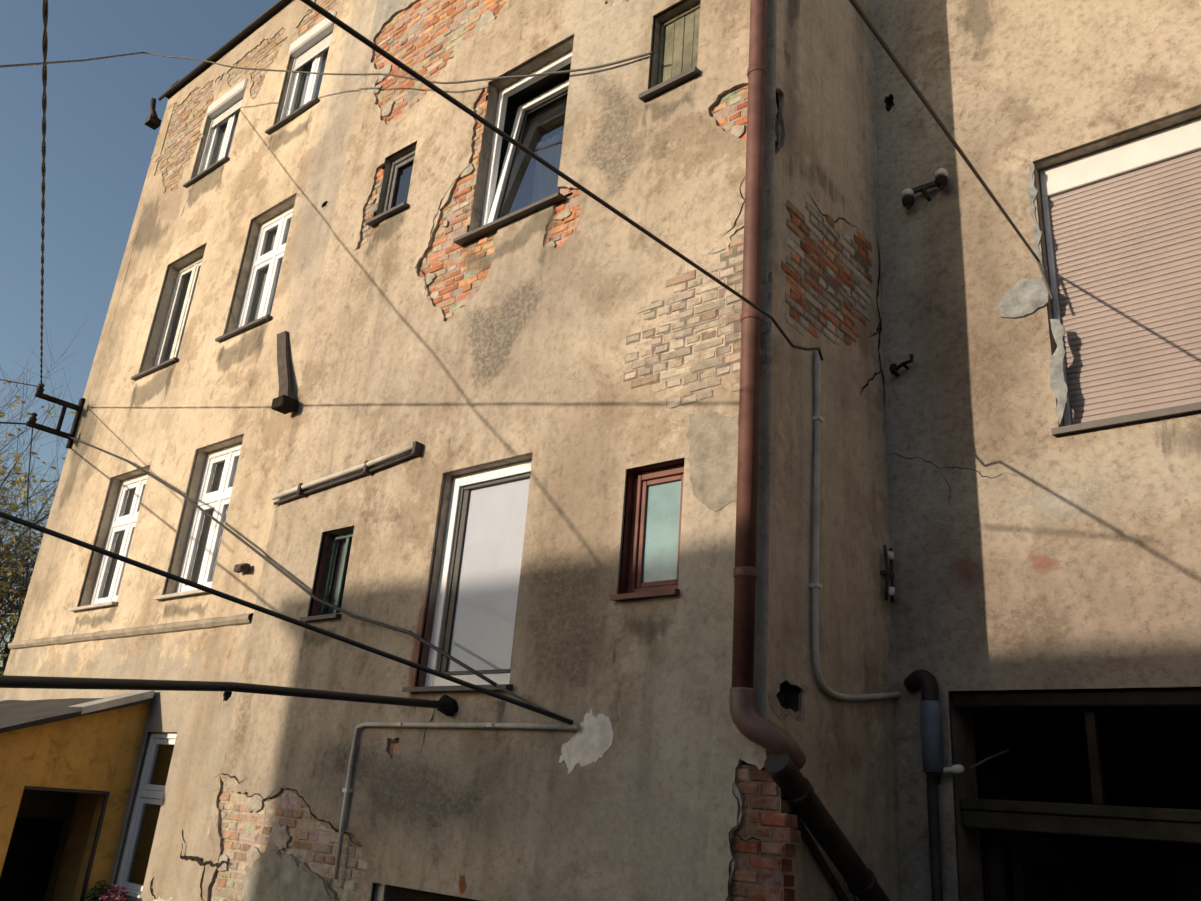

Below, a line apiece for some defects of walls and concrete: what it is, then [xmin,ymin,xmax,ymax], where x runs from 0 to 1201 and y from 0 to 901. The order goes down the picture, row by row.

flaking render [372,0,508,124]
flaking render [710,83,748,139]
flaking render [359,165,385,250]
flaking render [415,91,497,321]
flaking render [545,188,581,248]
flaking render [623,177,745,409]
flaking render [760,193,873,366]
crack [887,453,1017,503]
spalling [767,670,811,721]
flaking render [197,767,368,901]
flaking render [726,761,801,901]